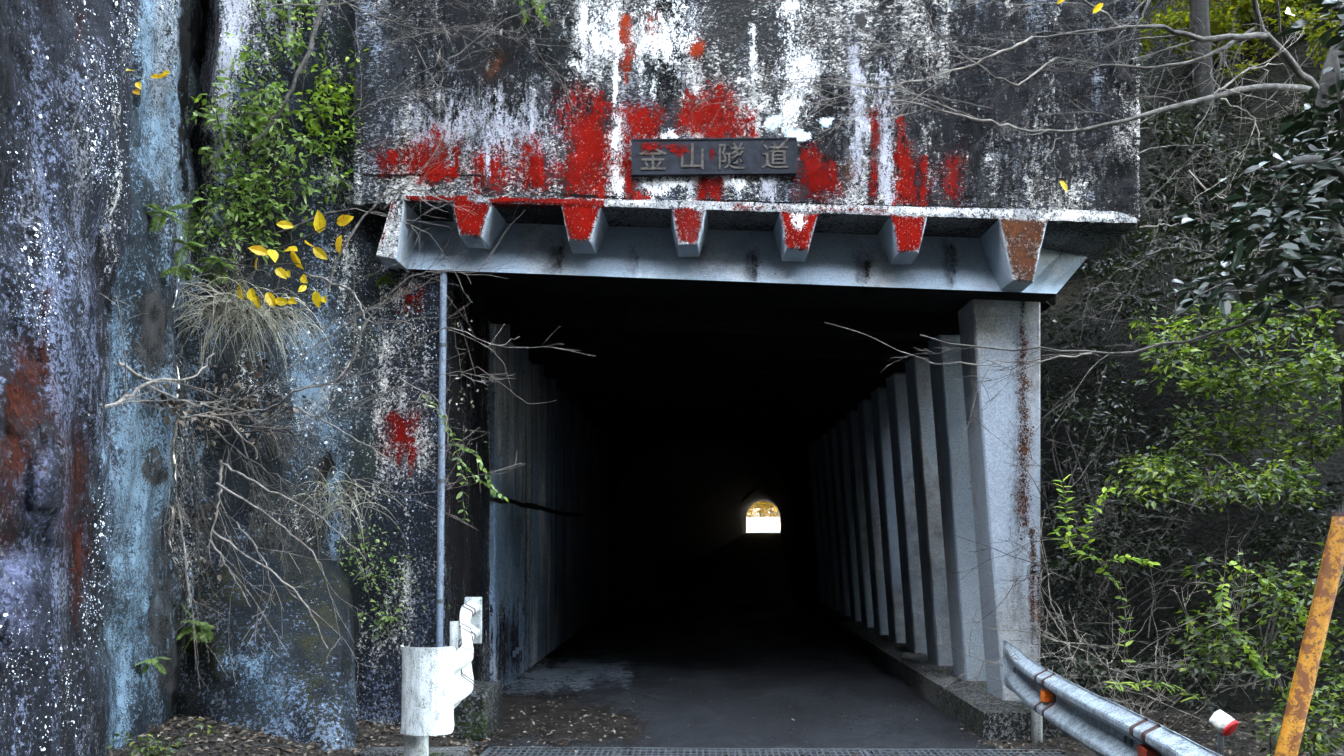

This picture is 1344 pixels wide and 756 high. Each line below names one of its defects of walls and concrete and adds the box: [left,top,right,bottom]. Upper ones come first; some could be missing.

damp [372,0,723,208]
damp [720,0,1013,230]
rust [999,217,1048,282]
rust [0,286,103,631]
rust [1010,301,1041,660]